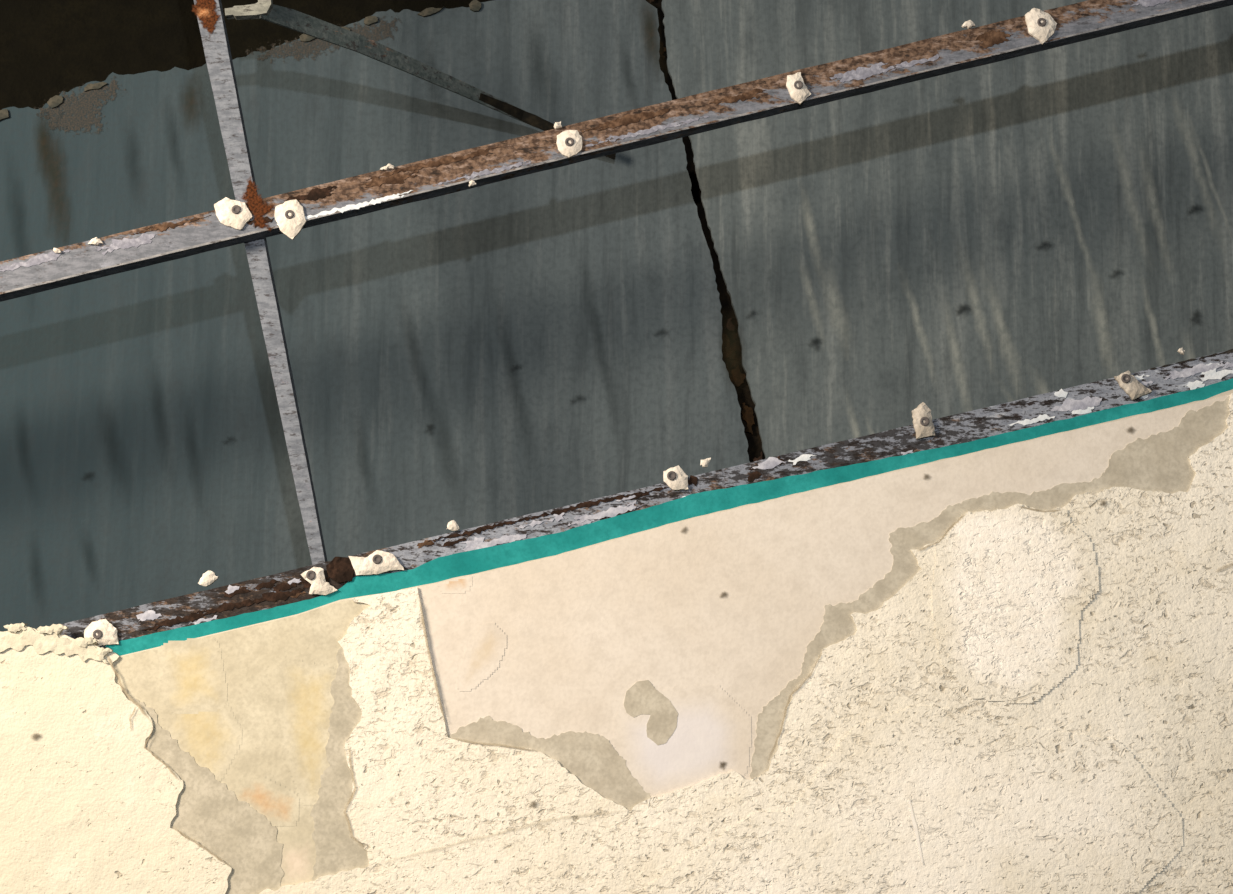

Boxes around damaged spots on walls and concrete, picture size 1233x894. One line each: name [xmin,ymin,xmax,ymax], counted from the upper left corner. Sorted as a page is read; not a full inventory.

corrosion [192,0,220,33]
corrosion [242,177,275,230]
corrosion [722,333,746,388]
corrosion [1150,349,1233,370]
corrosion [741,403,755,434]
corrosion [437,576,472,593]
peeling [417,361,1233,811]
peeling [0,577,370,894]